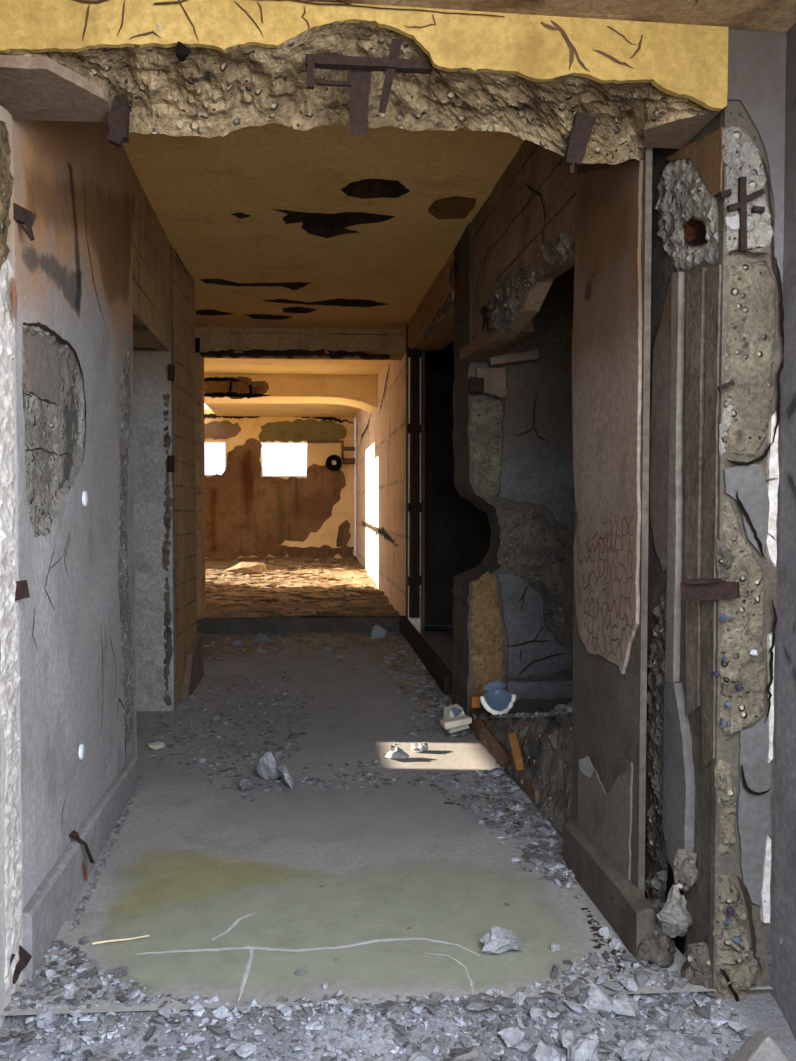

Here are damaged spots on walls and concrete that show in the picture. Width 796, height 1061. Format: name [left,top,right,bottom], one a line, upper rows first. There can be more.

crack [117,1,161,39]
crack [178,0,199,42]
crack [234,1,263,36]
crack [541,20,643,72]
crack [726,158,784,480]
spalling [0,20,709,747]
flaking render [0,120,85,995]
spalling [645,30,787,1002]
crack [736,491,776,559]
spalling [148,741,165,750]
peeling [276,764,294,789]
flaking render [577,756,633,880]